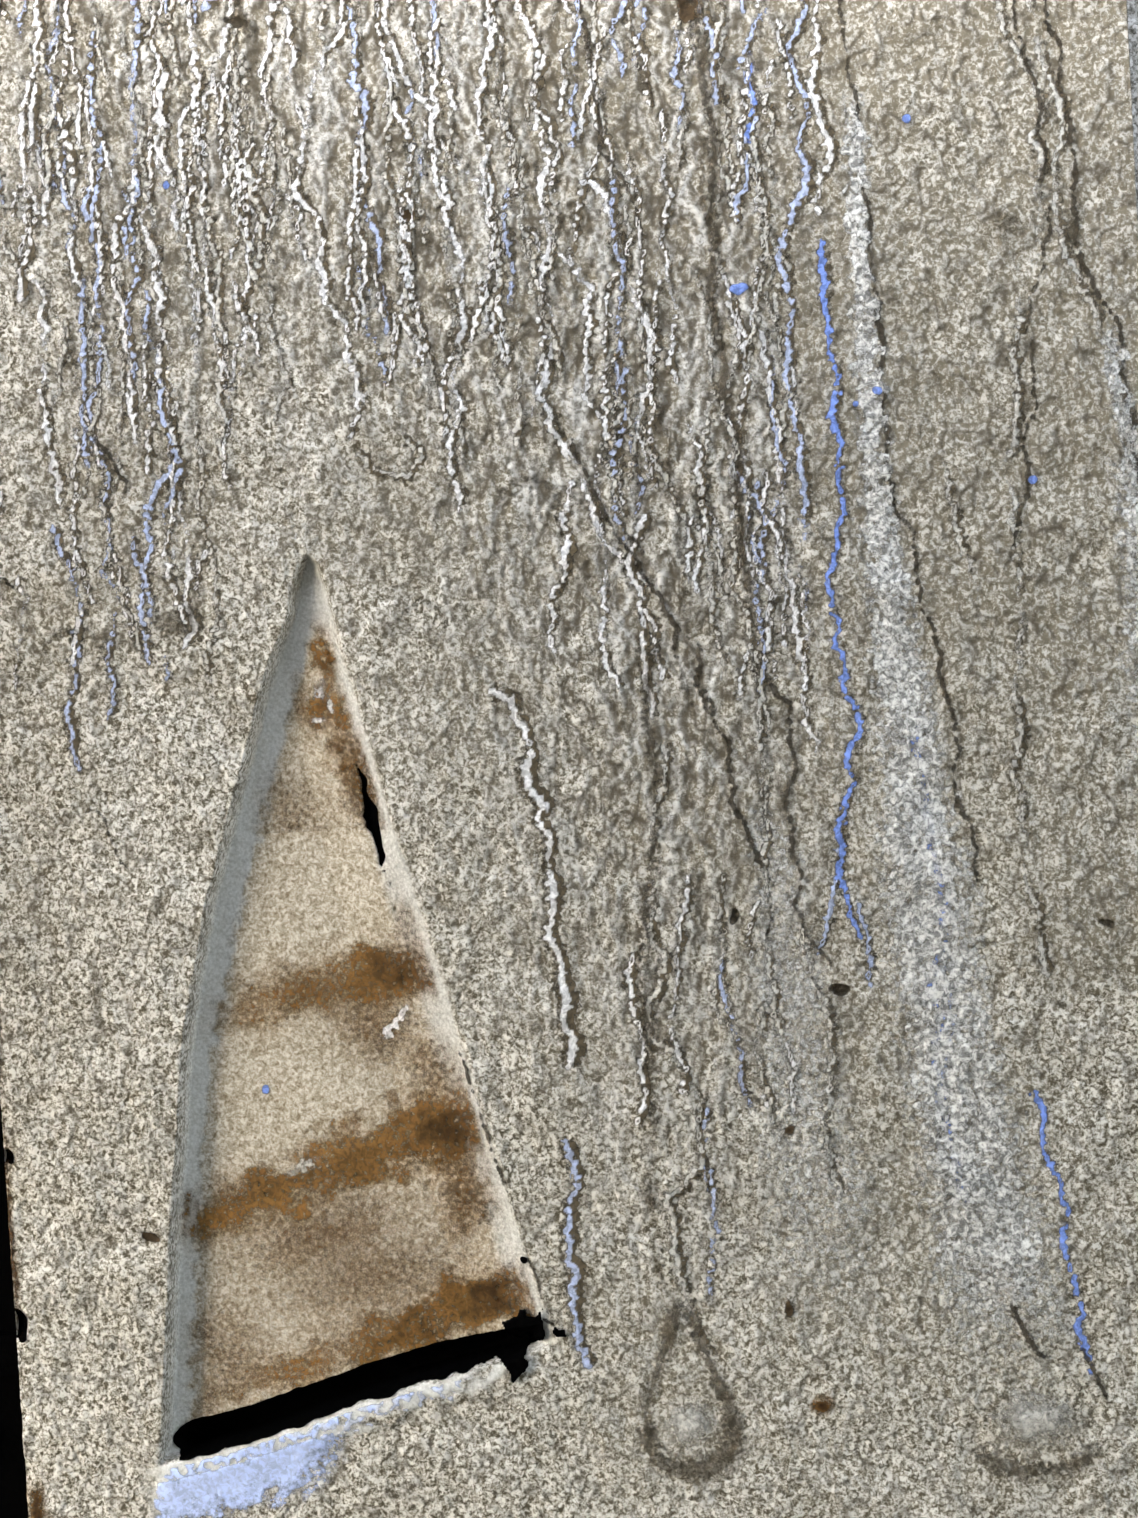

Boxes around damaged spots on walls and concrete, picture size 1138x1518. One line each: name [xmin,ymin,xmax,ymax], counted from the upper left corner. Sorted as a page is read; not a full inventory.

leakage [0,0,371,771]
crack [1011,0,1138,547]
corrosion [259,778,320,832]
corrosion [295,628,385,830]
crack [356,765,386,872]
leakage [307,0,1063,1369]
corrosion [182,905,536,1411]
leakage [621,874,747,1482]
leakage [971,1445,1102,1483]
leakage [1028,1090,1094,1375]